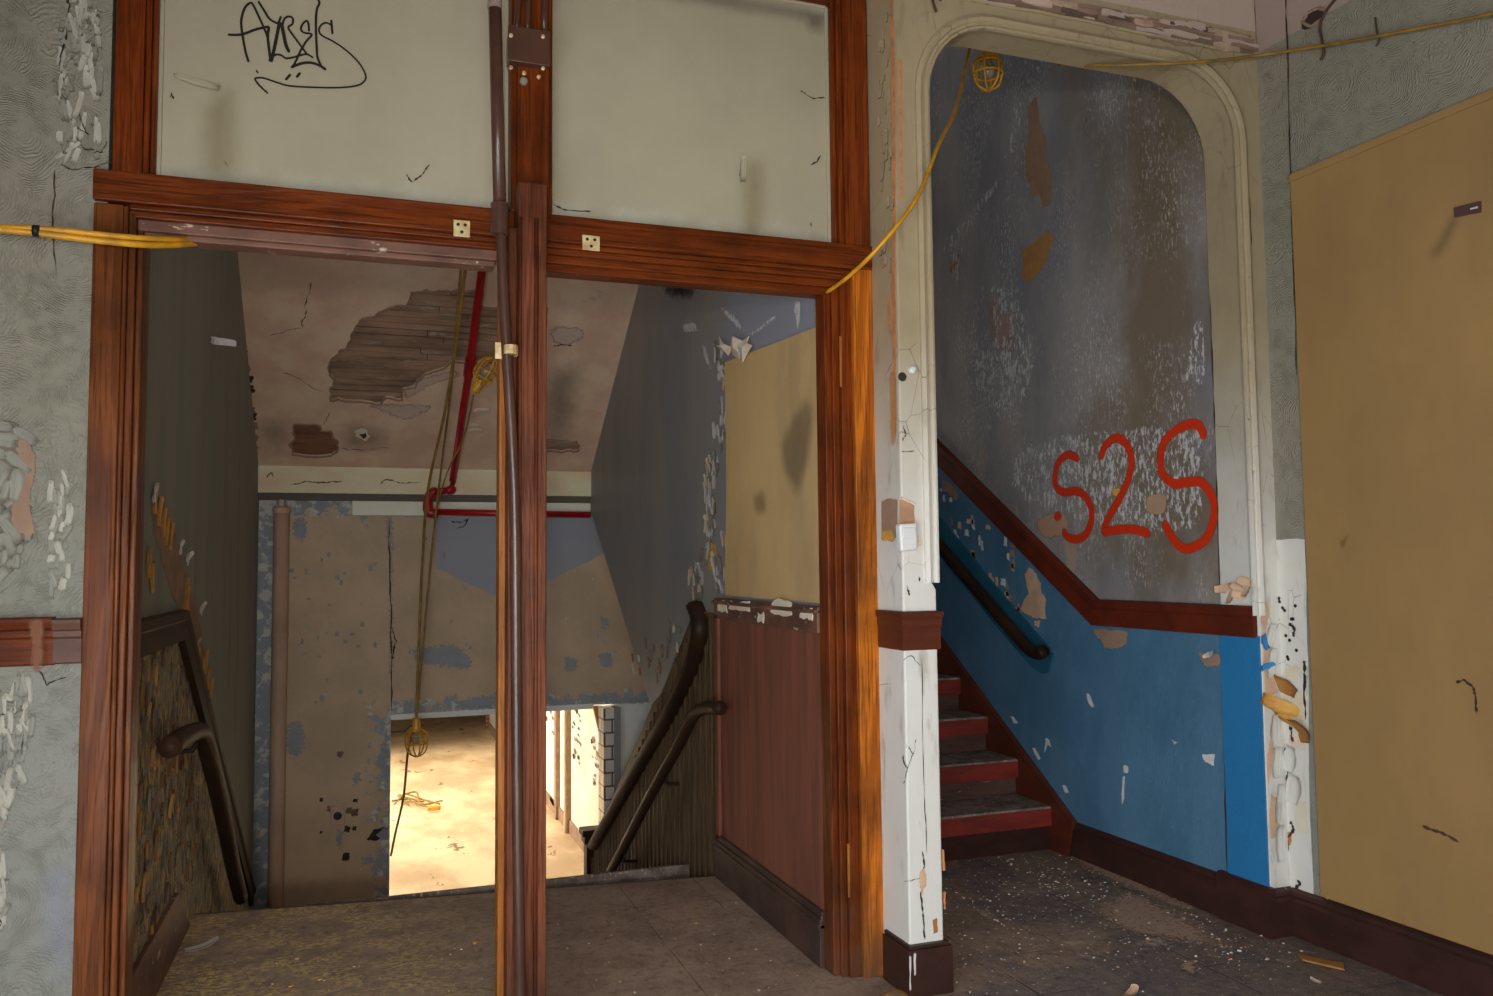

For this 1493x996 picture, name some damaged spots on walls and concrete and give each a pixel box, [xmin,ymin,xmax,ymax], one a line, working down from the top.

spalling [962,0,1259,54]
peeling [52,0,112,265]
peeling [877,0,903,375]
peeling [1025,97,1051,208]
peeling [1022,230,1054,282]
flaking render [327,289,497,406]
flaking render [288,423,339,458]
peeling [688,336,752,601]
peeling [937,468,1046,627]
peeling [1214,577,1252,604]
peeling [1260,538,1314,894]